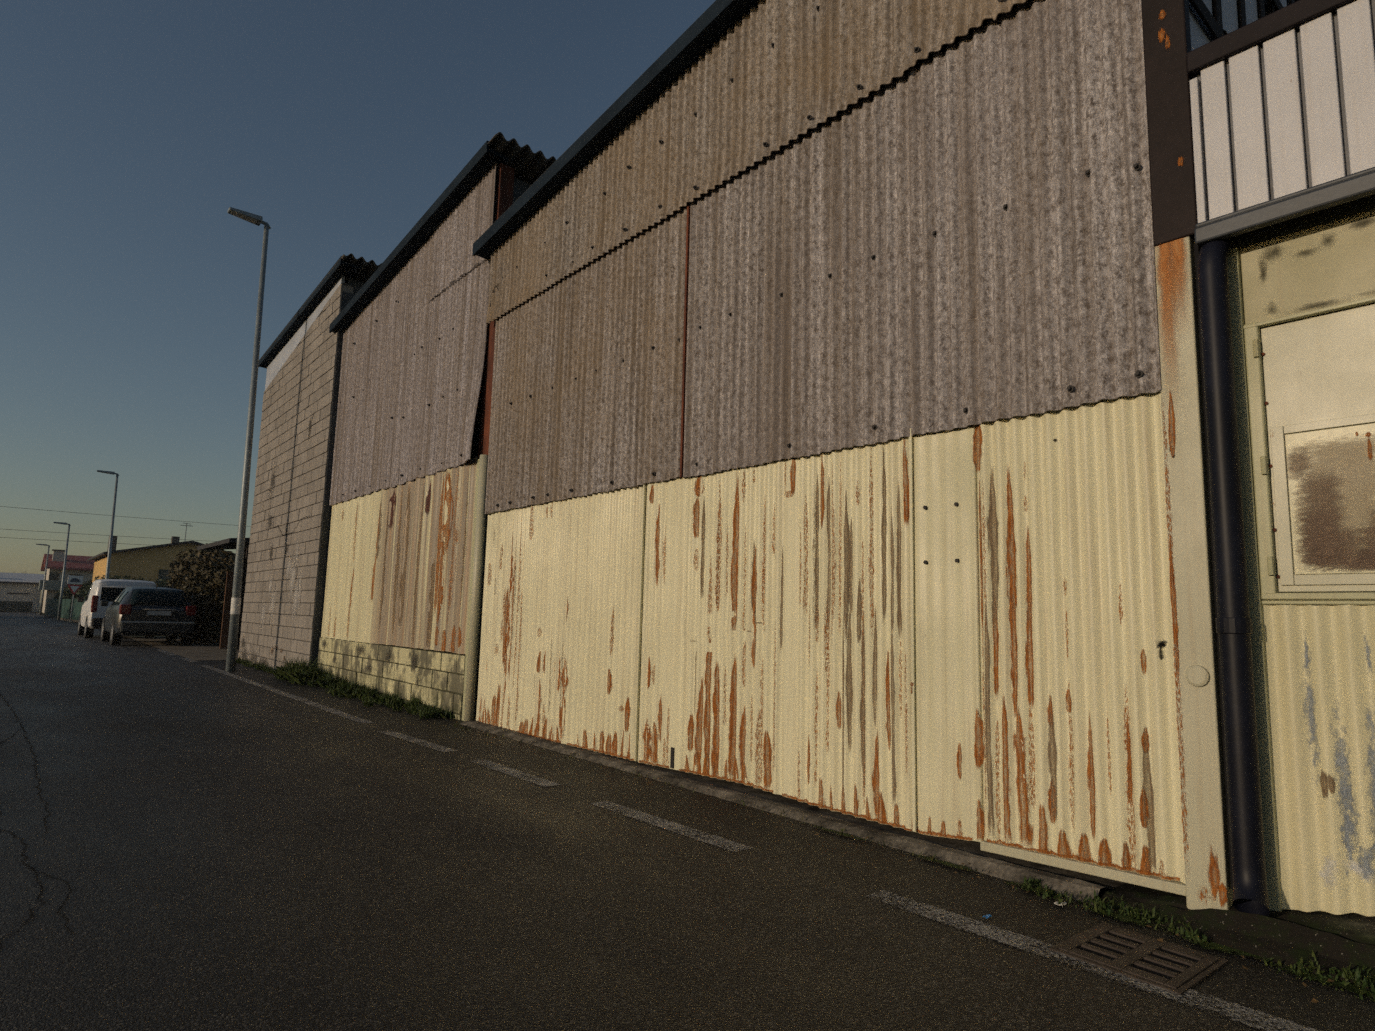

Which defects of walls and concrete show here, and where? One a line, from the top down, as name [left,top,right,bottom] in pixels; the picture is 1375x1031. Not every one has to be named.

rust [1158,238,1184,331]
rust [327,504,358,637]
rust [371,472,468,652]
rust [479,425,1180,881]
rust [1163,391,1189,853]
crack [0,693,74,948]
rust [1200,851,1227,907]
peeling [1304,686,1375,883]